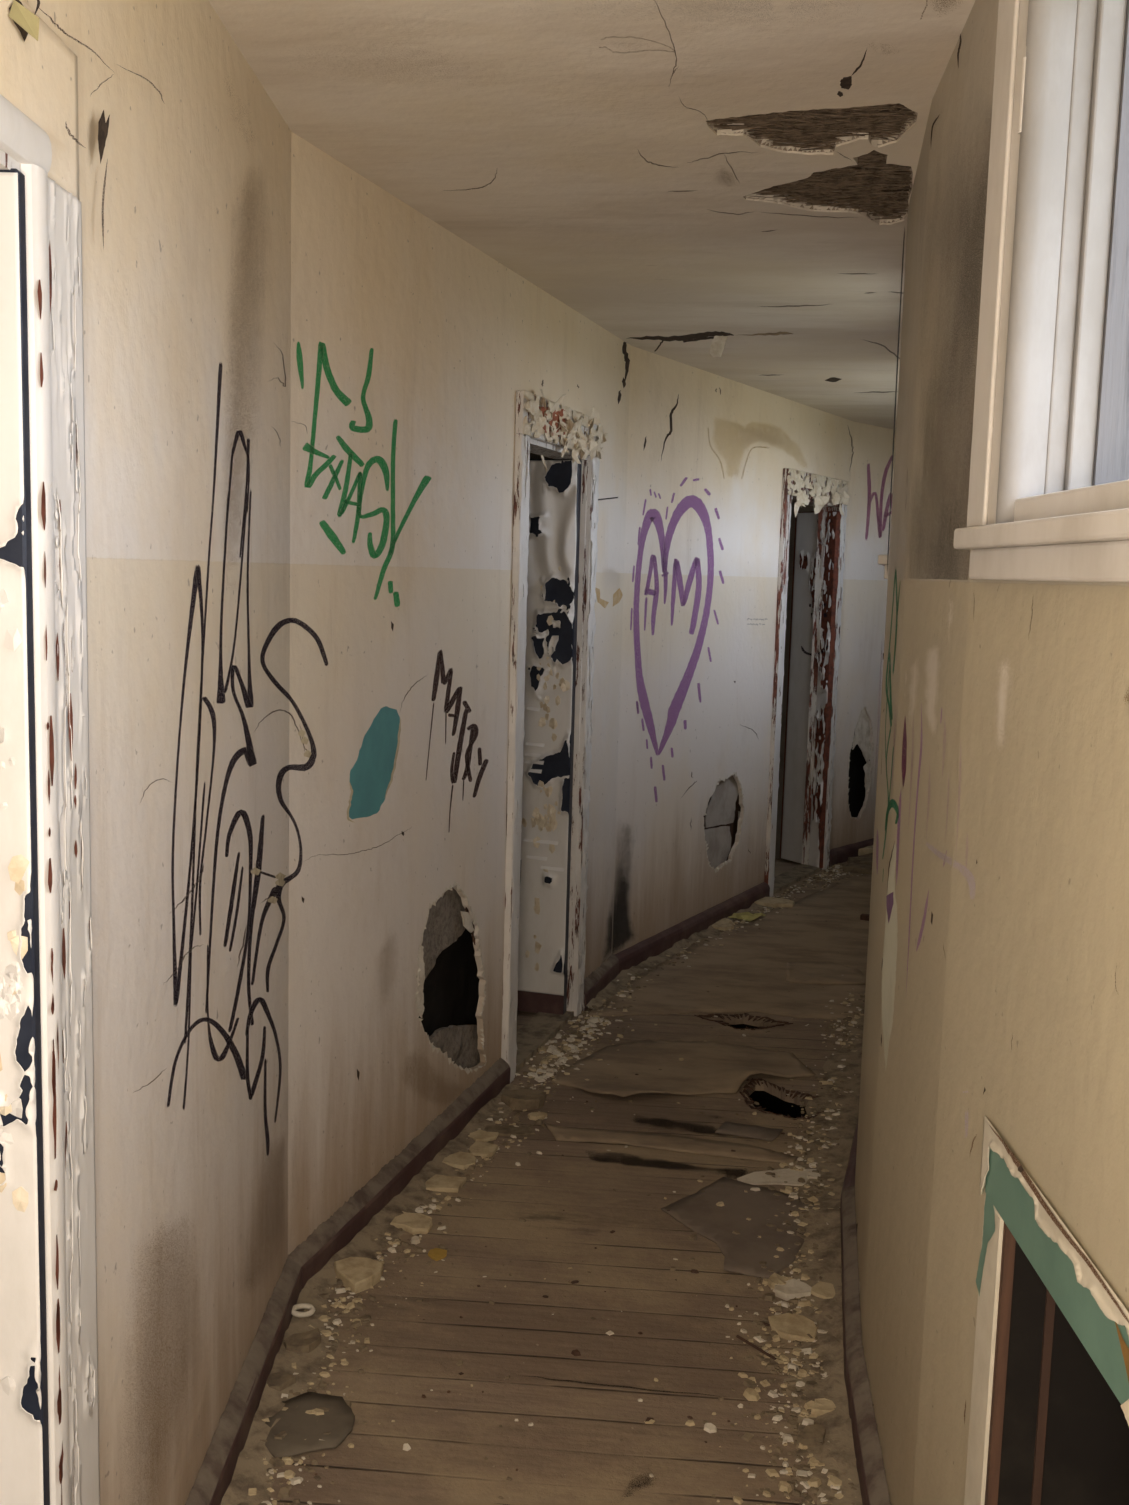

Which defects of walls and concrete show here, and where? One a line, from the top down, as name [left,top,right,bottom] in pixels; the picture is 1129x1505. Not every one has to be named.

crack [638,0,847,232]
crack [837,50,867,97]
crack [955,34,963,64]
crack [644,394,679,460]
crack [618,273,903,404]
peeling [0,172,44,1505]
peeling [48,177,100,1505]
peeling [508,389,623,1083]
peeling [768,468,874,897]
spalling [415,881,487,1074]
peeling [980,1115,1129,1338]
flaking render [1121,1399,1129,1426]